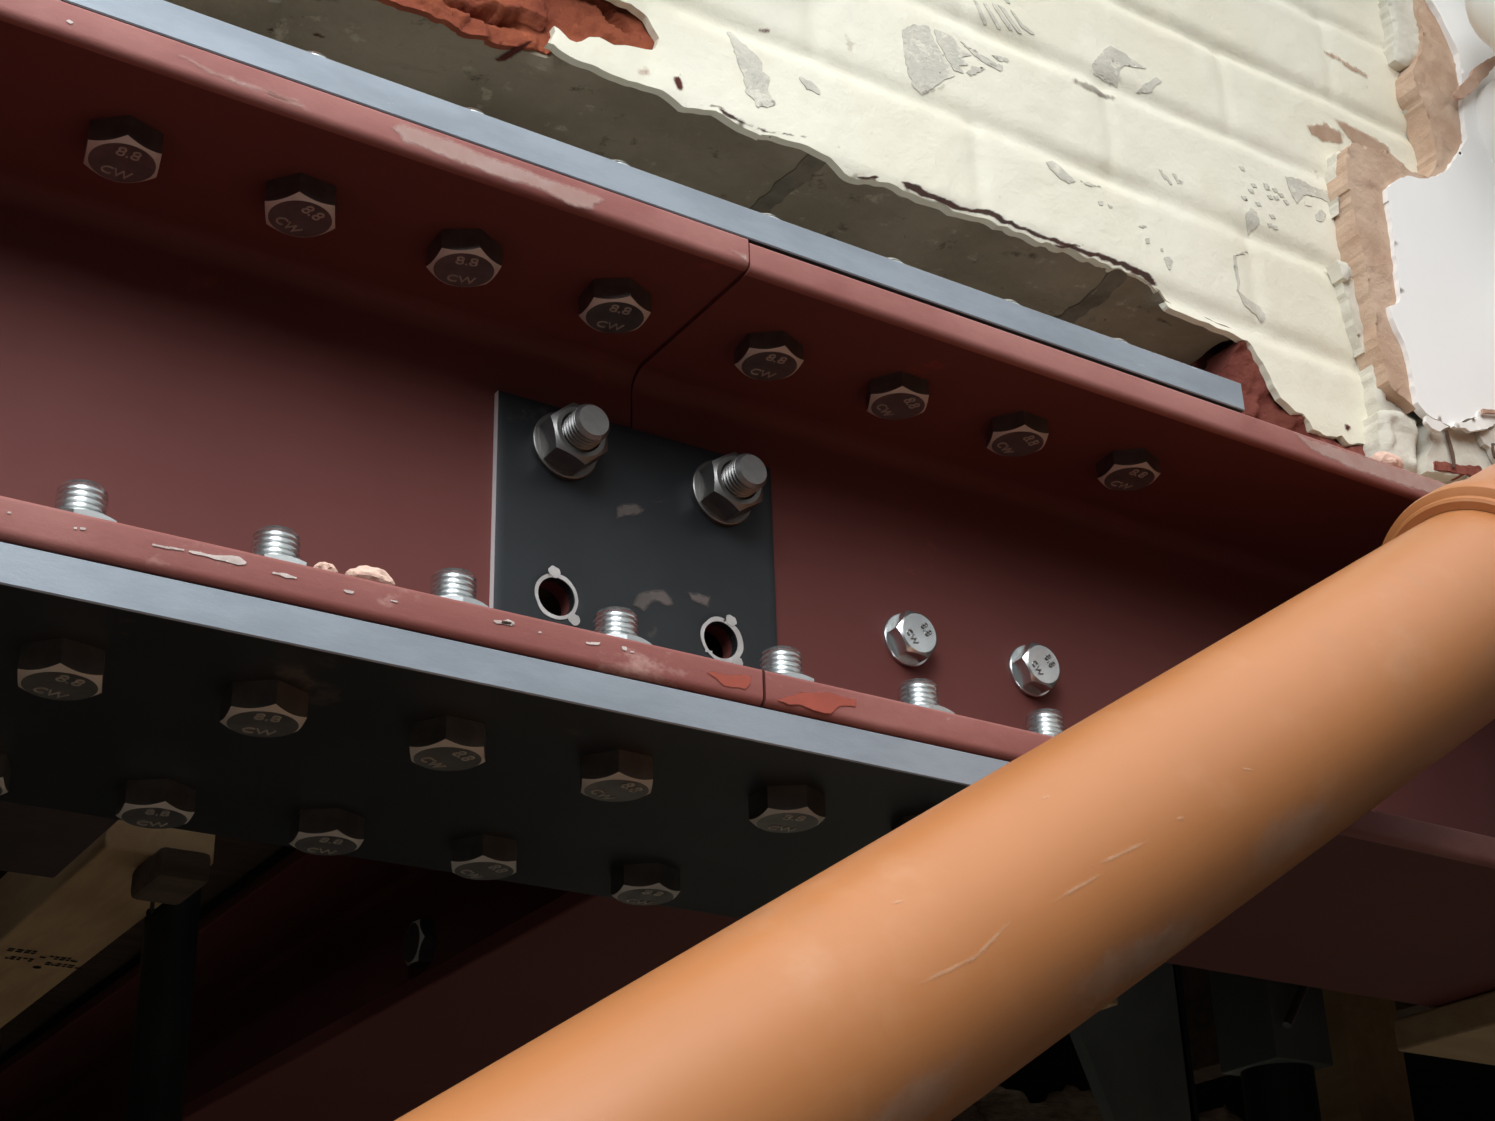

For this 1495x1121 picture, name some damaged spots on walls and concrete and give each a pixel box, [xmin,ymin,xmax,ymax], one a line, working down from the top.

spalling [376,0,654,55]
peeling [726,31,775,108]
peeling [799,77,820,94]
peeling [902,24,1009,95]
peeling [1092,46,1162,94]
spalling [1190,0,1495,484]